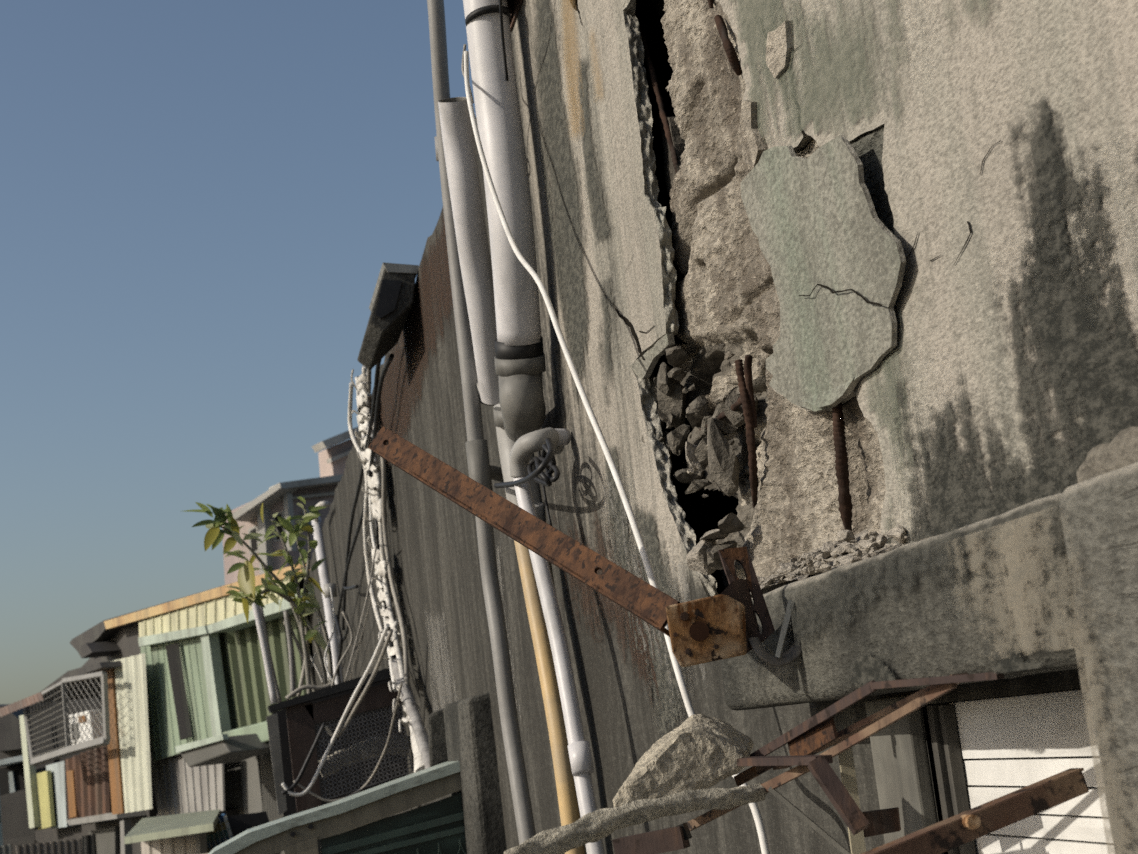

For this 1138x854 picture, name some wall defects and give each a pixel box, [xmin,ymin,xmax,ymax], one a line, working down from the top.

spalling [622,0,906,597]
damp [750,99,1138,669]